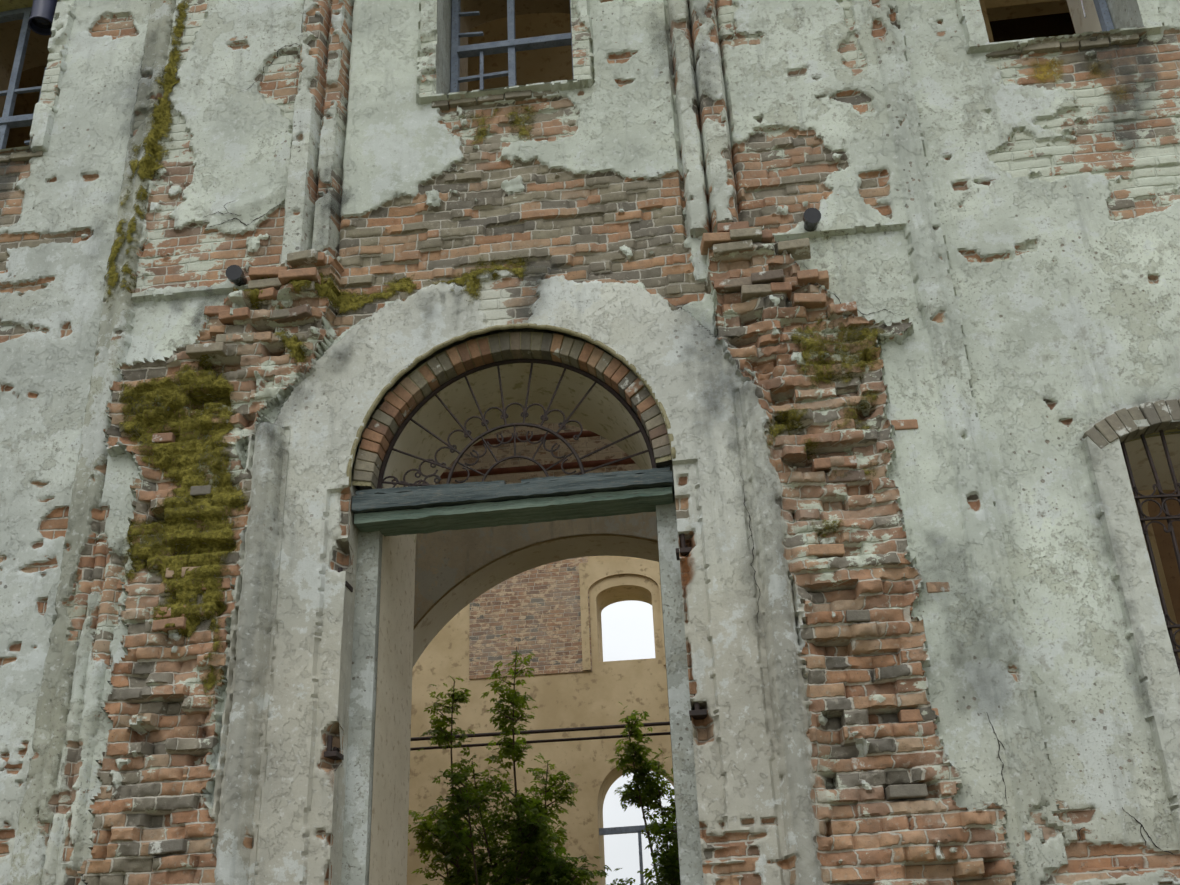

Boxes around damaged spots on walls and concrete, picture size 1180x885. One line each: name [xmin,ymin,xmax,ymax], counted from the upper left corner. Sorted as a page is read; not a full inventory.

spalling [174,0,209,86]
spalling [606,50,638,64]
spalling [703,0,764,54]
spalling [815,0,888,114]
spalling [984,27,1180,221]
spalling [0,136,93,296]
spalling [959,239,1039,264]
spalling [0,318,72,343]
spalling [1044,398,1074,427]
spalling [45,88,1018,885]
spalling [0,821,15,857]
spalling [1041,808,1180,885]